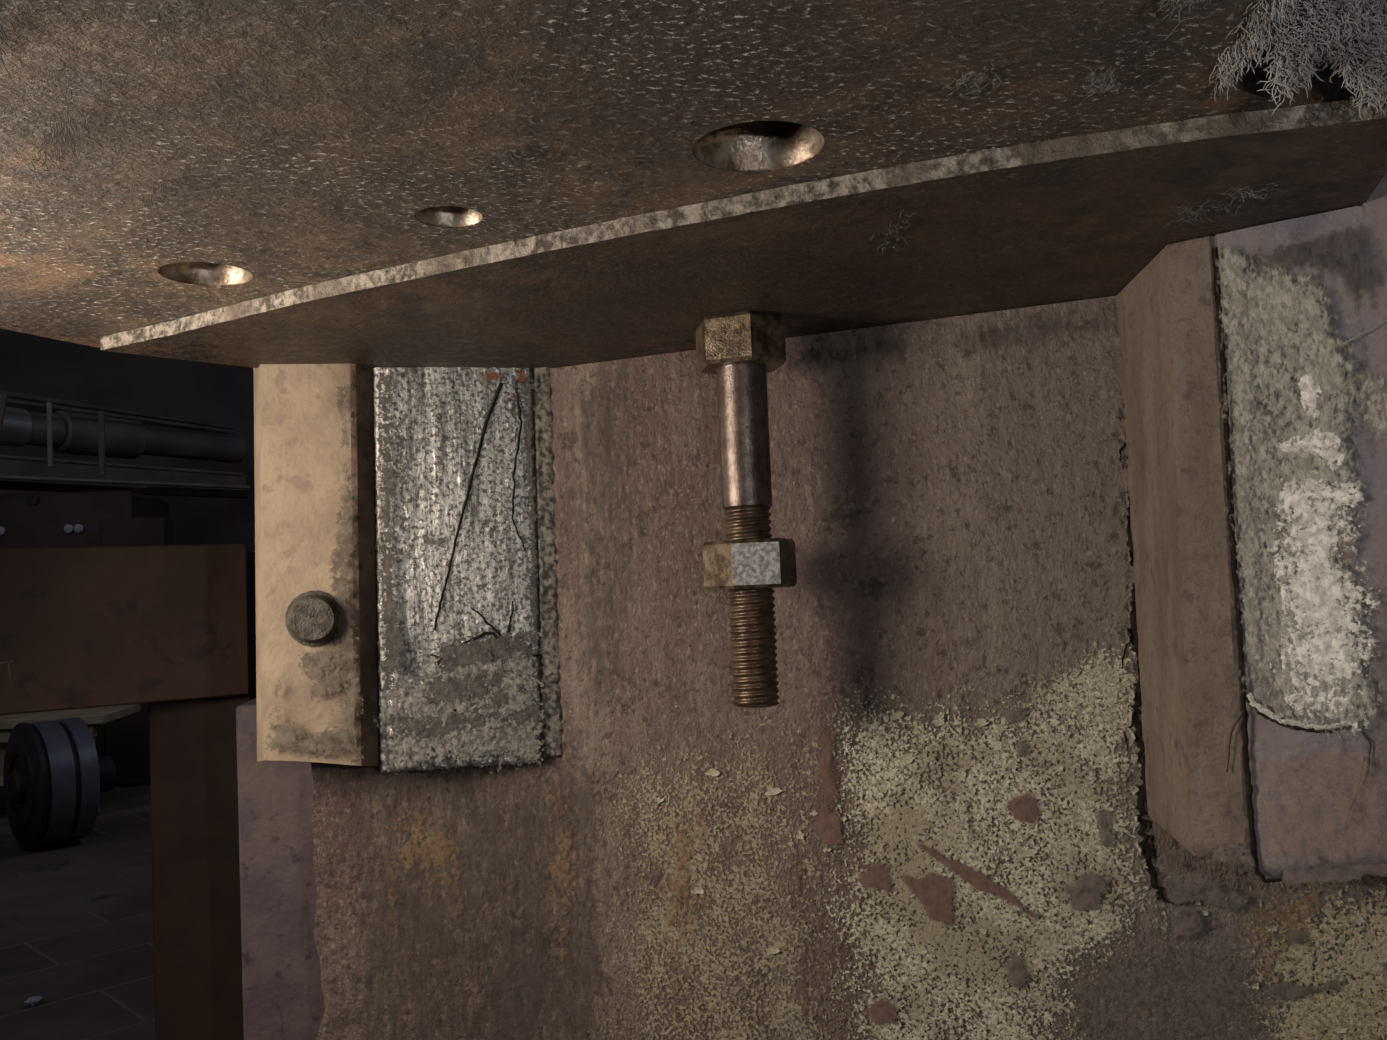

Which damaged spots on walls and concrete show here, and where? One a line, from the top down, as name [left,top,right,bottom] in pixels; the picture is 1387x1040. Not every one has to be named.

leakage [1252,226,1375,312]
crack [1118,403,1200,906]
crack [1214,247,1372,883]